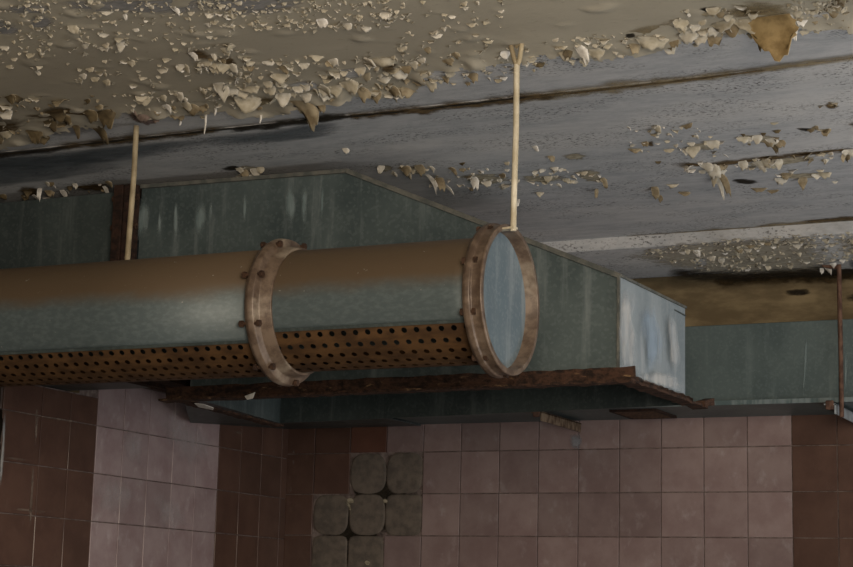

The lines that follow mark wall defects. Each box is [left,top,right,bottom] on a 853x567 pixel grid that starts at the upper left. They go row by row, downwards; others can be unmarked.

peeling [545,0,850,67]
peeling [0,0,547,145]
peeling [377,156,608,198]
peeling [627,122,853,200]
peeling [636,232,853,275]
damp [674,266,853,295]